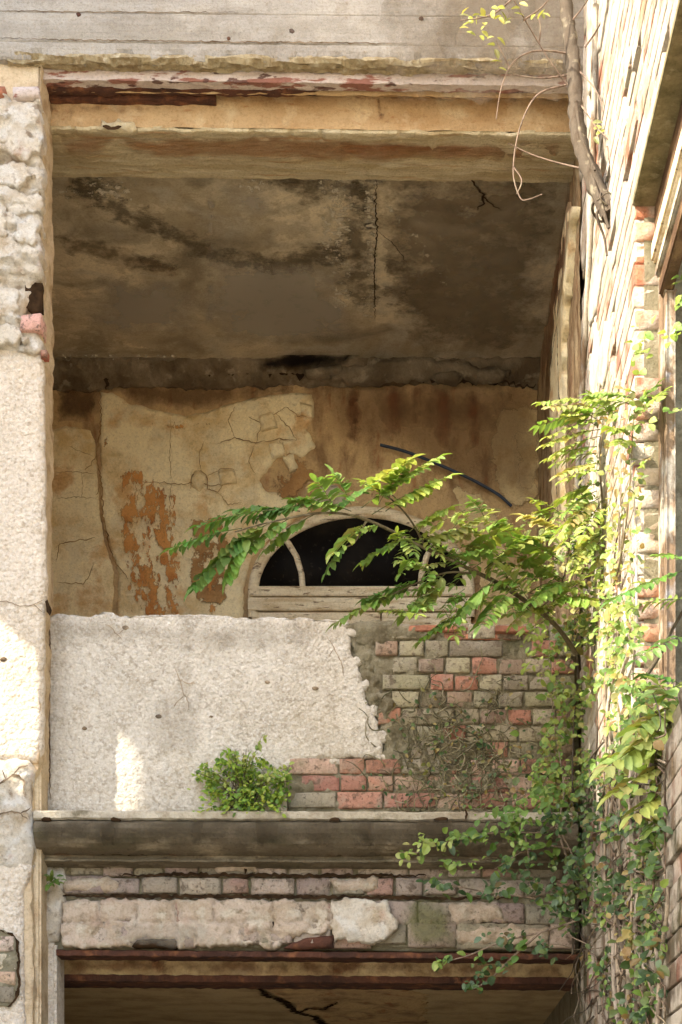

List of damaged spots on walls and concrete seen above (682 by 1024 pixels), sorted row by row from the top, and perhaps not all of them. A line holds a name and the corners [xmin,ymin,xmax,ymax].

spalling [0,86,177,362]
damp [56,177,400,326]
crack [373,180,408,315]
crack [471,180,501,210]
crack [194,373,329,381]
crack [423,261,565,526]
crack [56,378,128,584]
peeling [118,469,232,616]
crack [135,407,306,547]
spalling [286,563,577,823]
spalling [0,930,21,1007]